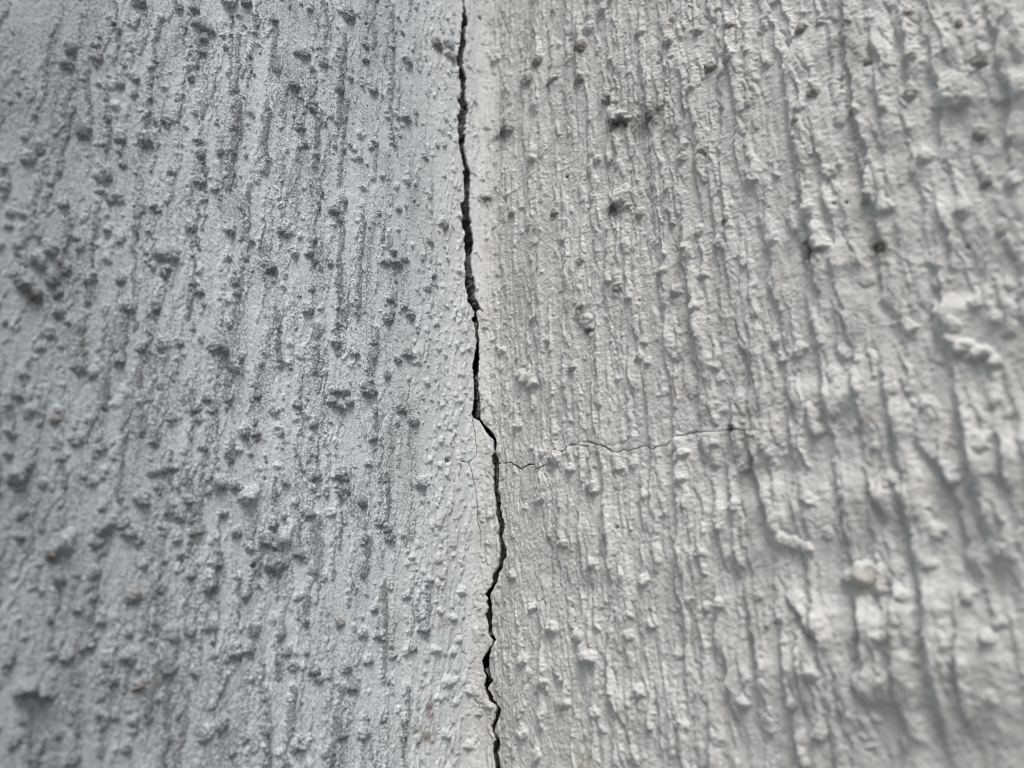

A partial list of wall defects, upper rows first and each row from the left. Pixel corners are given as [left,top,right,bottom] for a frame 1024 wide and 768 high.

crack [453,0,790,768]